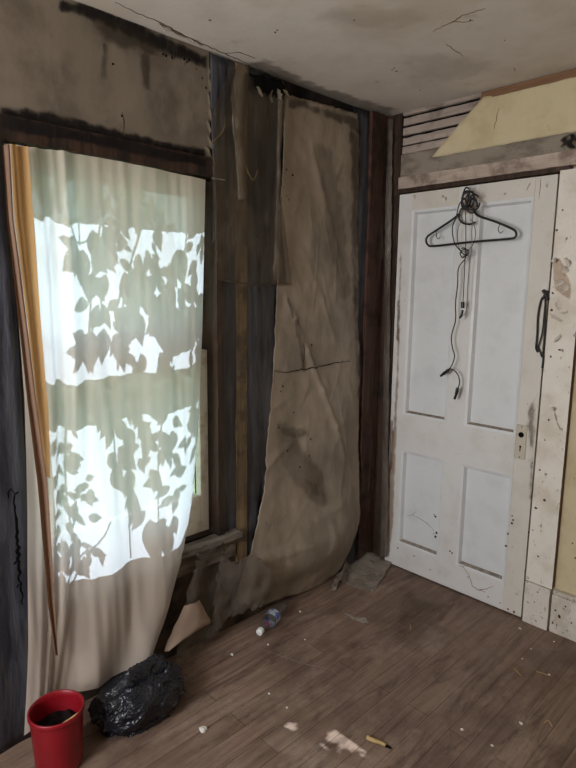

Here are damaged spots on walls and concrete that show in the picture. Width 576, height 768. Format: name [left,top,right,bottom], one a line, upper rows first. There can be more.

crack [115,2,271,76]
crack [433,8,485,54]
peeling [256,86,290,102]
damp [3,114,206,166]
crack [277,338,351,373]
crack [7,488,24,605]